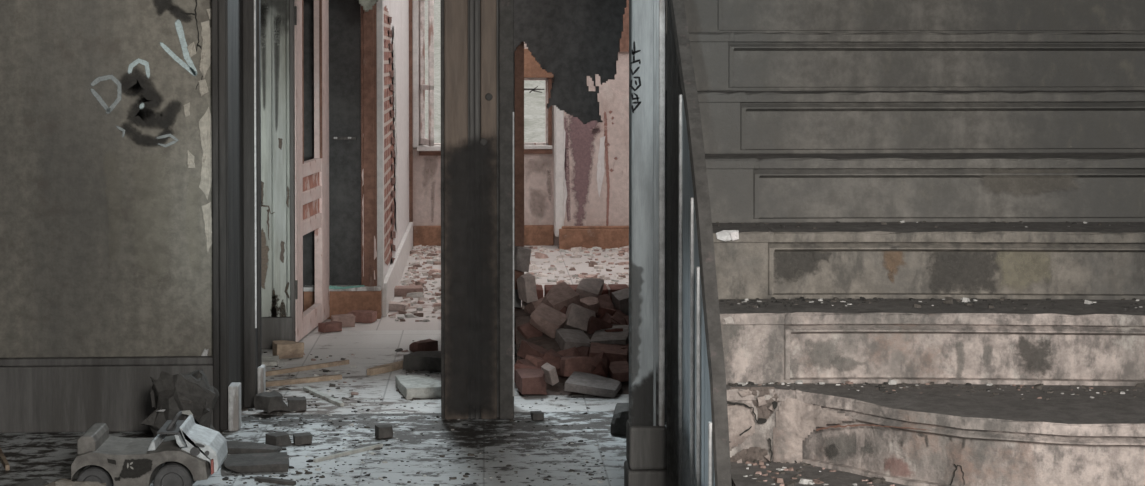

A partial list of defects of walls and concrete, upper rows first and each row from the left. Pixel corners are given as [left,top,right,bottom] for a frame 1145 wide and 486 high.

peeling [183,8,213,252]
leakage [564,115,600,226]
leakage [808,340,861,370]